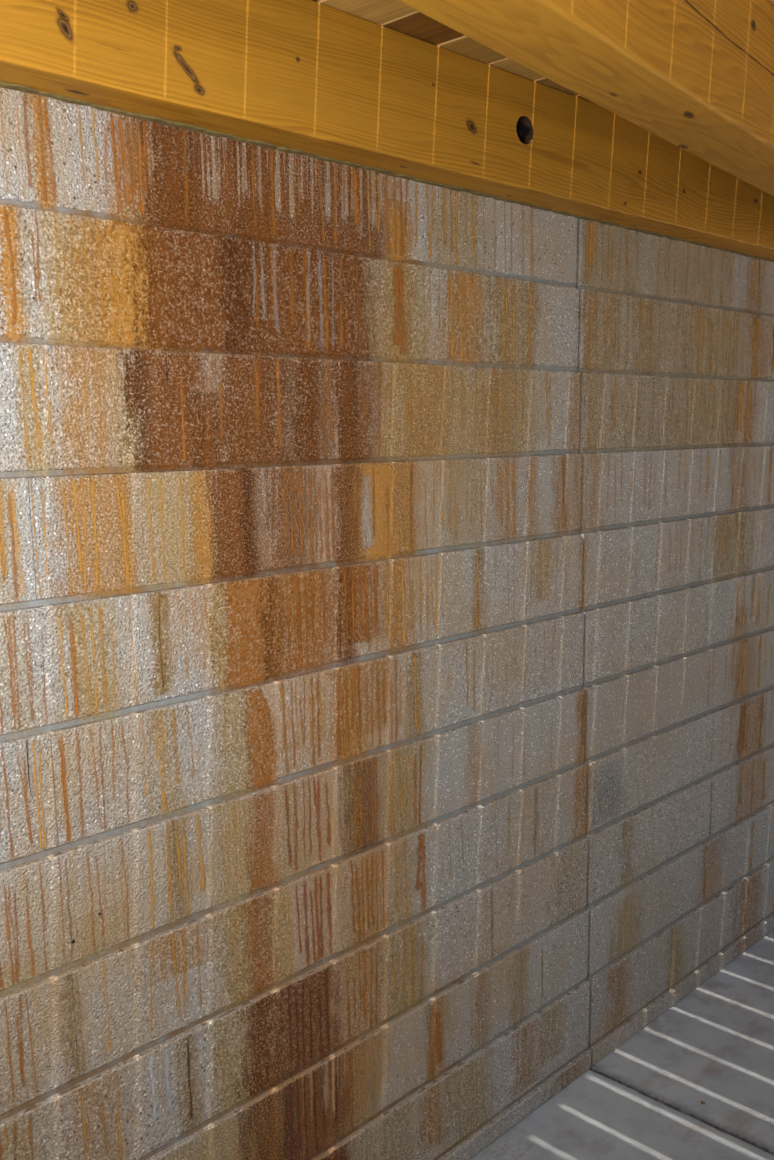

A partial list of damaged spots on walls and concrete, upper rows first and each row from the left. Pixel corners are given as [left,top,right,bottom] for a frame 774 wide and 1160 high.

rust [0,93,531,1160]
rust [737,578,765,809]